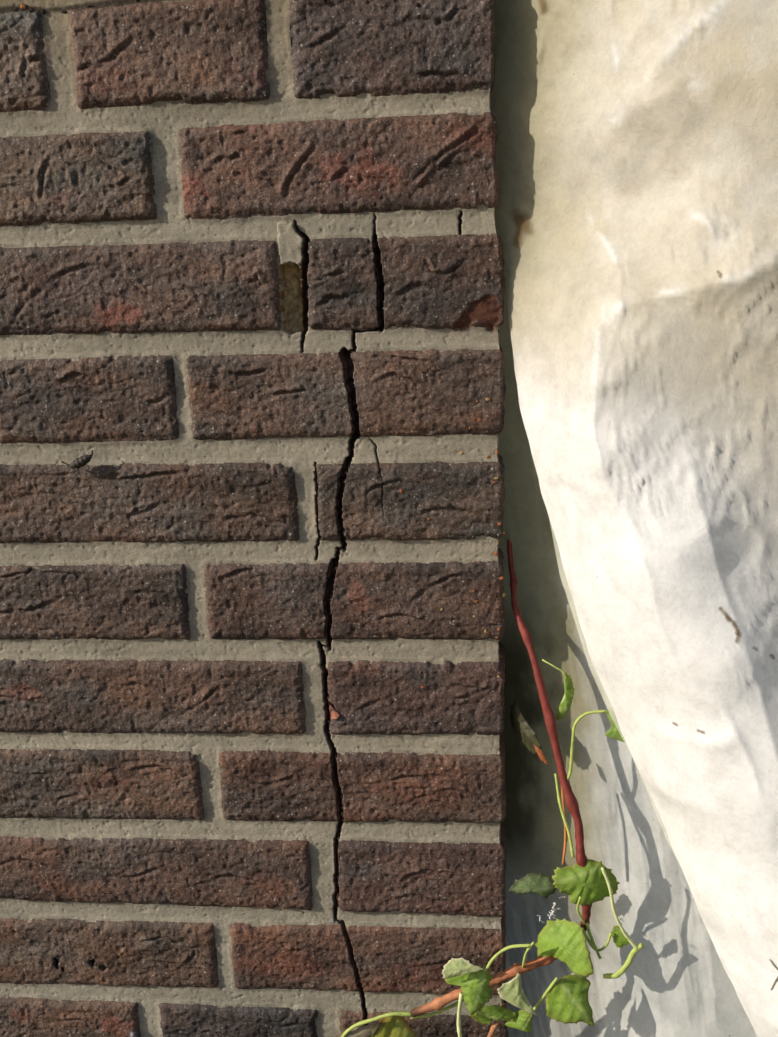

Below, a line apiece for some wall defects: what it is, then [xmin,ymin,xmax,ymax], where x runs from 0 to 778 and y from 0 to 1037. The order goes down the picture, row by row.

crack [294,222,310,351]
spalling [454,295,501,330]
crack [315,219,384,1025]